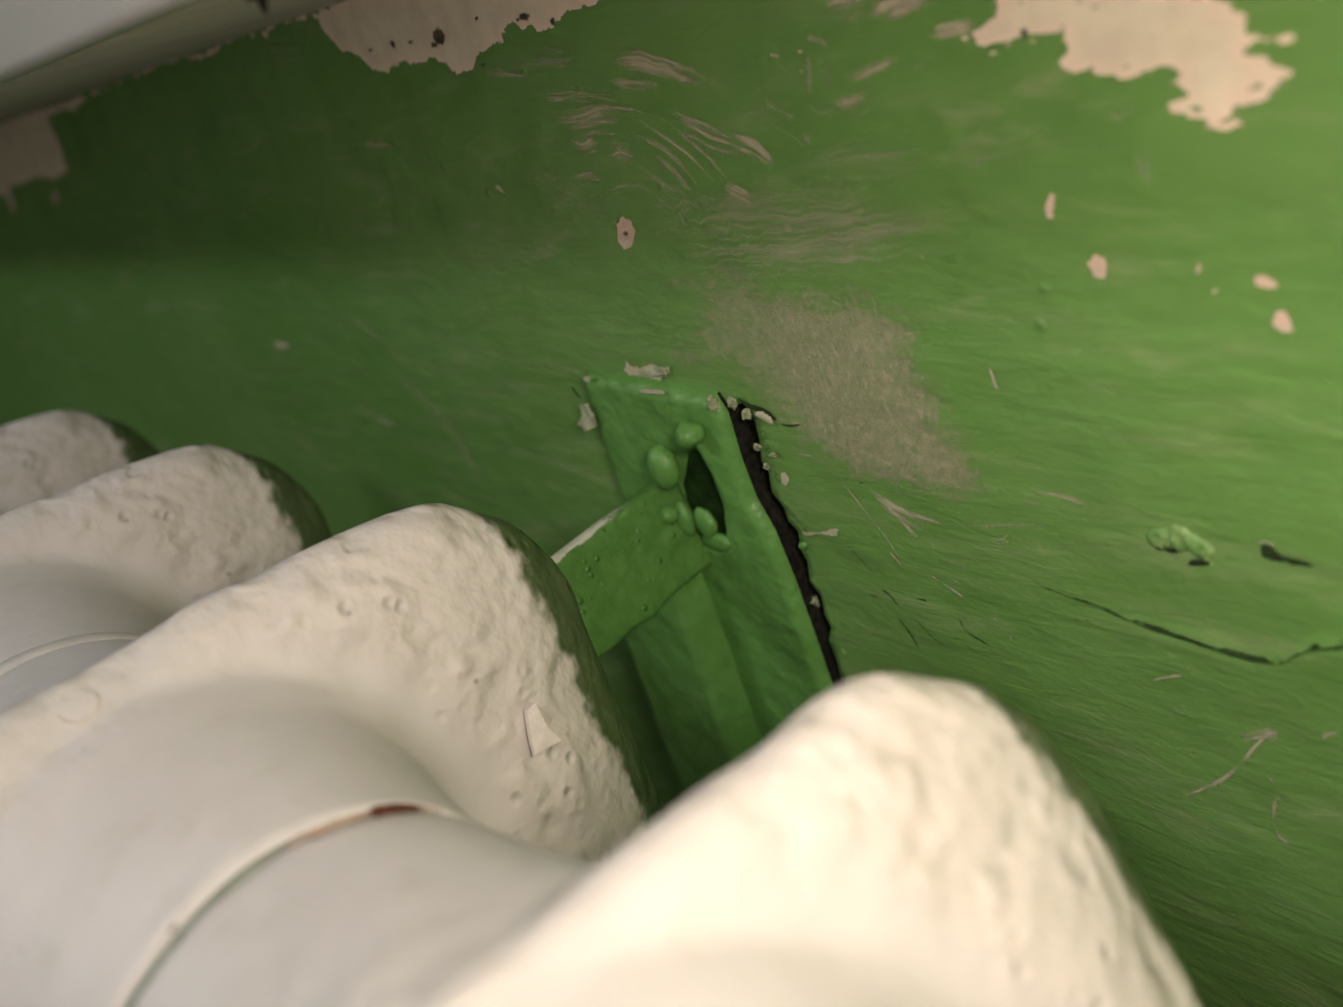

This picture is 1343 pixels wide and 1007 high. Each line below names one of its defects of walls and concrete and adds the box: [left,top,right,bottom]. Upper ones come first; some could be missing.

peeling [962,0,1295,131]
peeling [0,0,599,214]
peeling [1045,193,1055,219]
peeling [616,217,635,250]
peeling [1087,254,1107,279]
peeling [1254,275,1278,289]
crack [708,394,800,470]
crack [810,596,820,607]
crack [1035,582,1343,664]